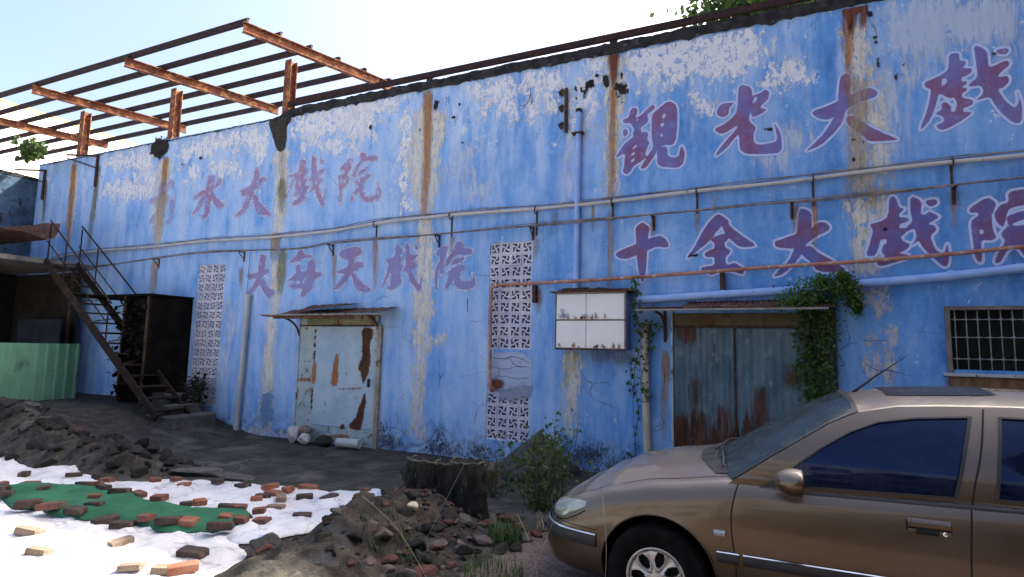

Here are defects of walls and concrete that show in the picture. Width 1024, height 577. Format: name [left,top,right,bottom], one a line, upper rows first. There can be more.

corrosion [65,163,79,247]
corrosion [150,157,174,283]
peeling [99,95,422,218]
damp [272,147,290,234]
corrosion [407,91,448,440]
corrosion [600,53,627,200]
peeling [433,25,814,204]
corrosion [836,5,895,197]
damp [843,186,896,278]
crack [493,356,530,379]
damp [560,350,611,469]
peeling [858,286,902,387]